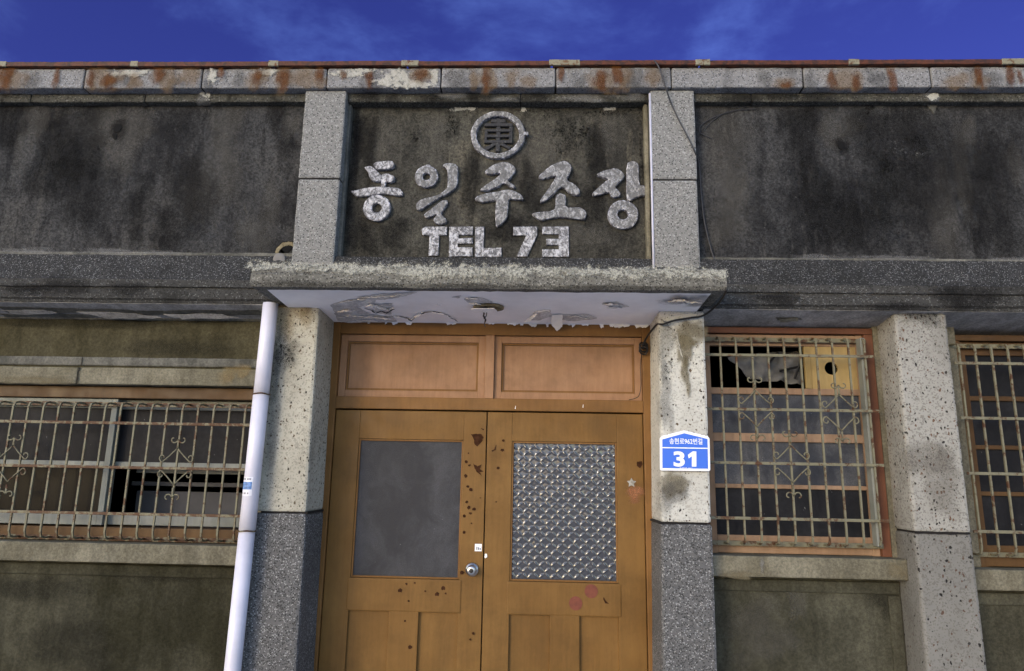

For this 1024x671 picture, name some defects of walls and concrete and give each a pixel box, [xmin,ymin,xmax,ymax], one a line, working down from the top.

rust [87,69,139,86]
rust [828,71,860,88]
peeling [330,292,417,325]
peeling [488,310,649,331]
water stain [665,321,707,396]
water stain [662,473,688,497]